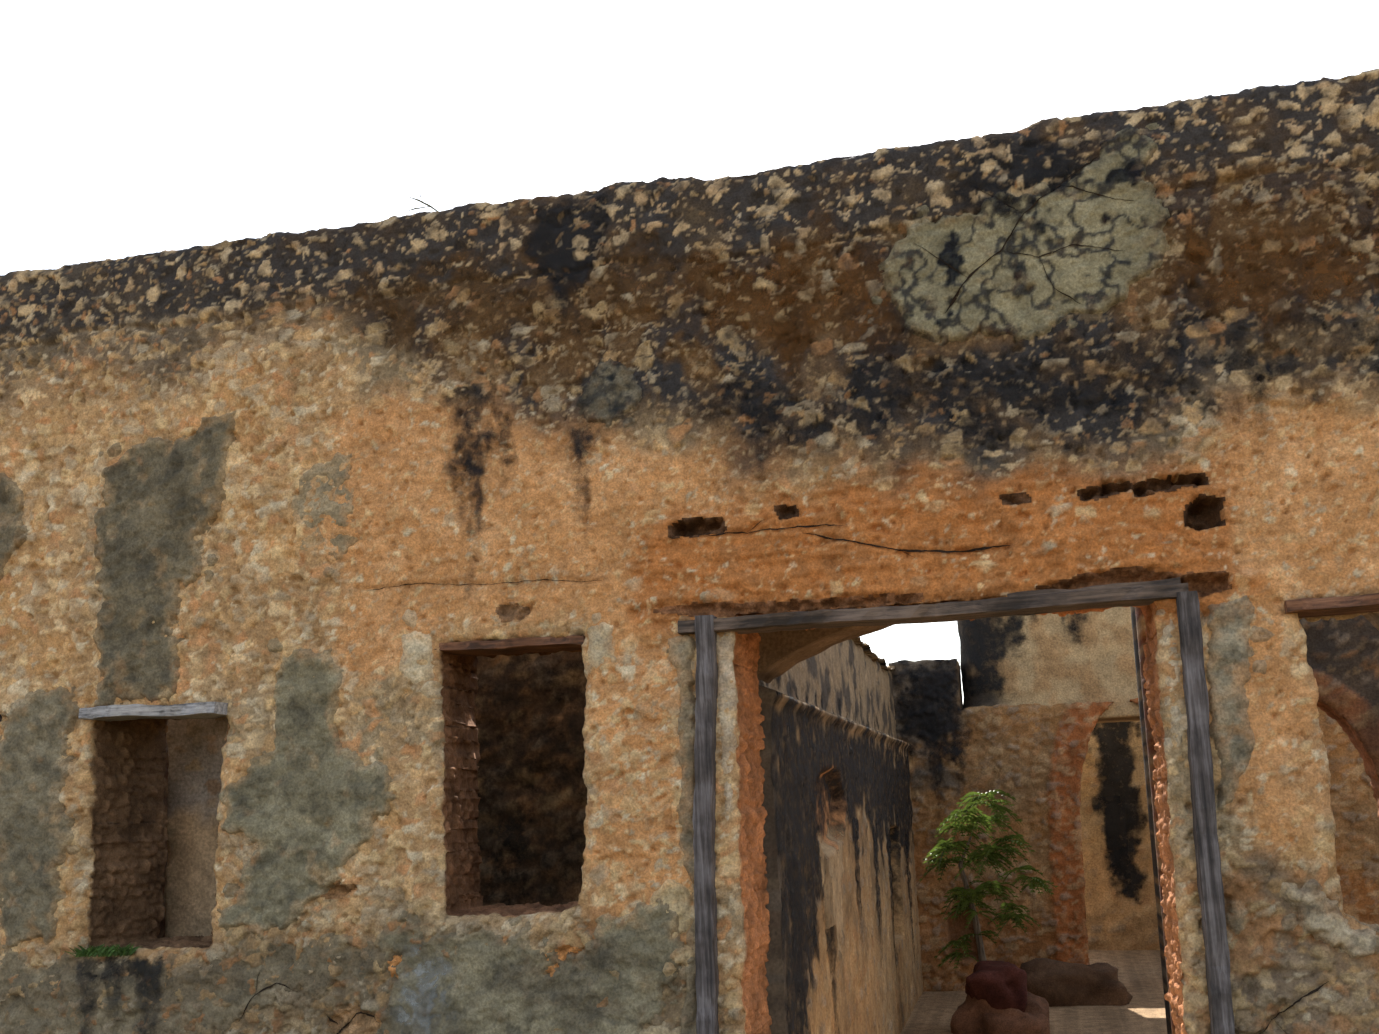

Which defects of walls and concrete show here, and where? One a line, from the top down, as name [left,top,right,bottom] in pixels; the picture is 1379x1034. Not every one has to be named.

crack [914,156,1134,313]
water stain [446,385,509,529]
water stain [572,431,592,458]
water stain [698,336,1220,445]
water stain [1214,330,1295,380]
water stain [1062,613,1086,641]
water stain [760,615,1034,1034]